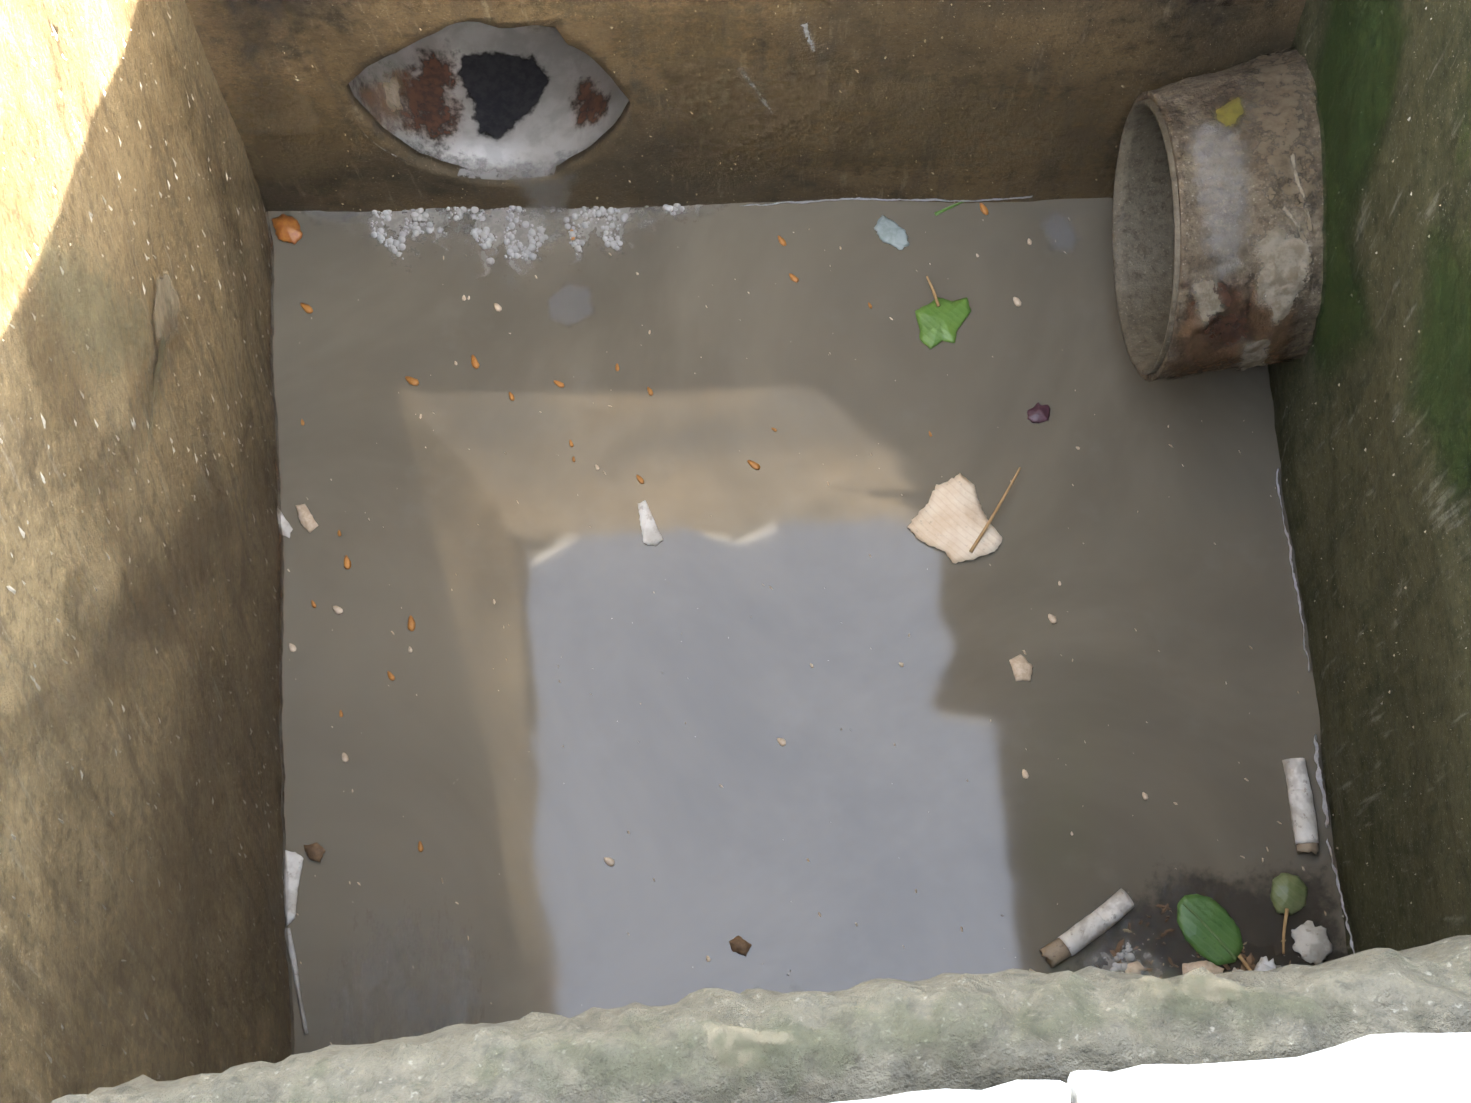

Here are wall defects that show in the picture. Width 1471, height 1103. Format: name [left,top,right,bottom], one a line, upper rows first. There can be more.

rust [360,49,462,145]
rust [571,79,609,126]
rust [1164,288,1304,379]
water stain [1276,469,1310,671]
water stain [1314,735,1355,952]